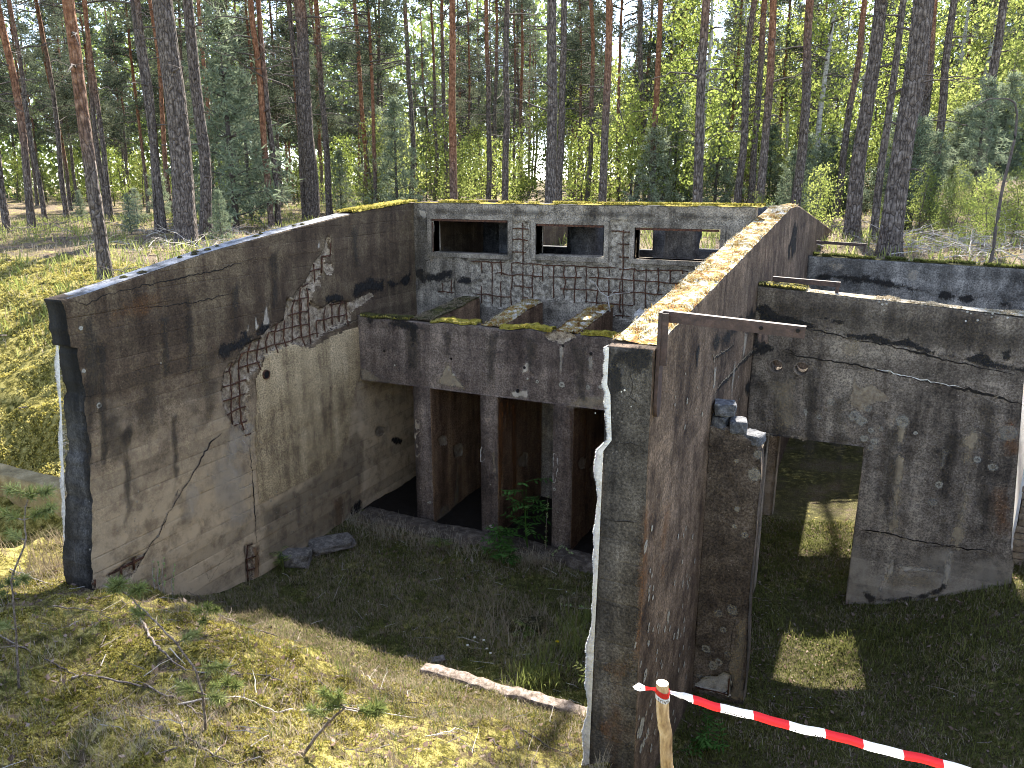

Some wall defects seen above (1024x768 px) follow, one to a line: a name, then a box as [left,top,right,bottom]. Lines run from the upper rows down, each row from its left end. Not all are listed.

crack [70,257,256,309]
spalling [470,220,697,322]
flaking render [221,237,373,503]
crack [783,329,1022,405]
crack [128,432,222,579]
crack [858,529,993,555]